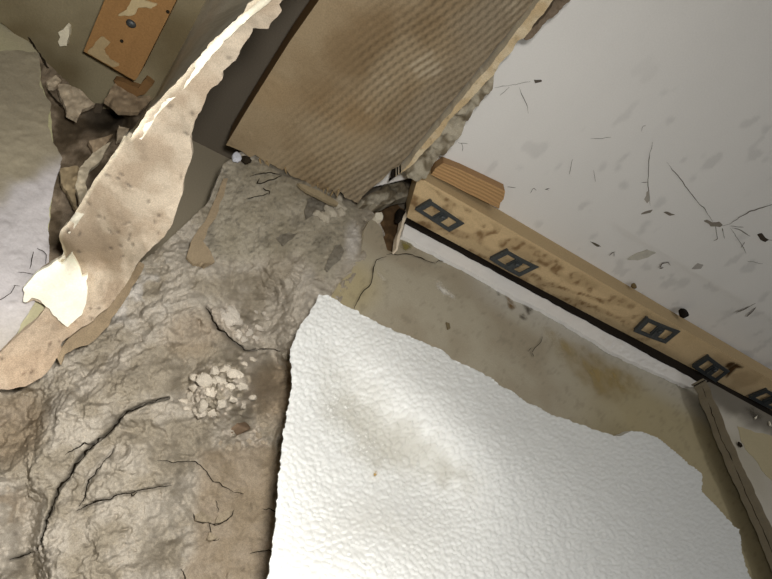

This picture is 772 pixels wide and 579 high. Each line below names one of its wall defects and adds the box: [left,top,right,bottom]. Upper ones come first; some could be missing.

crack [669,165,772,264]
spalling [0,0,405,579]
crack [354,253,441,308]
crack [10,397,170,560]
crack [158,460,243,541]